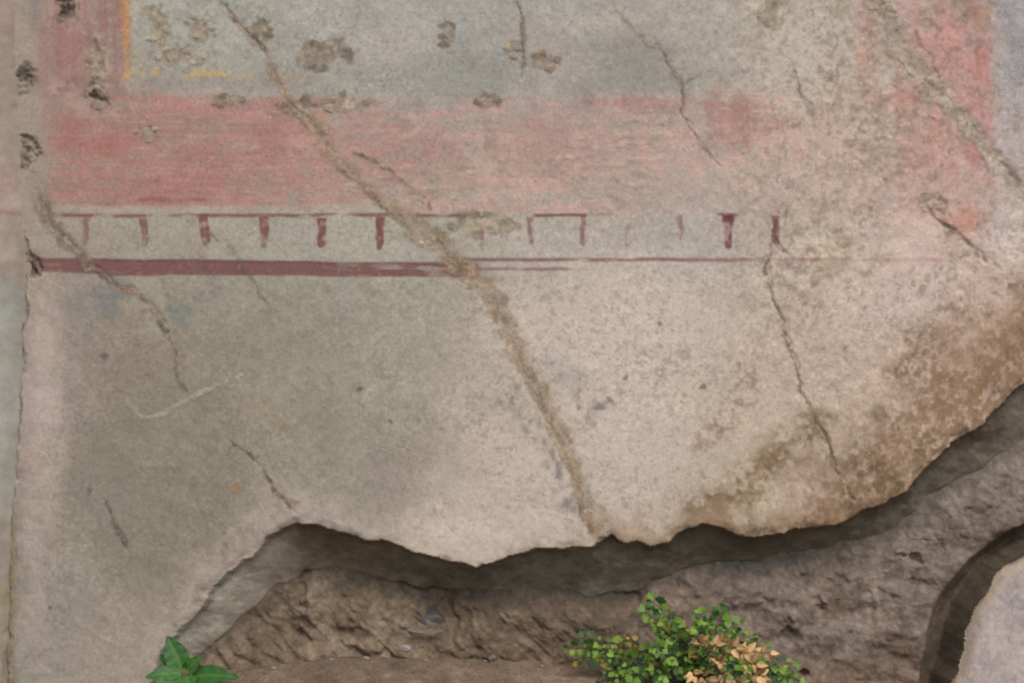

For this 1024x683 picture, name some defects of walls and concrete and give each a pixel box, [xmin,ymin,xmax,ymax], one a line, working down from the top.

spalling [15,61,38,93]
spalling [54,0,80,23]
spalling [81,37,108,109]
spalling [146,2,217,66]
spalling [297,39,354,72]
spalling [276,91,375,118]
crack [616,9,711,157]
spalling [19,134,42,169]
crack [34,193,188,390]
crack [220,0,616,540]
crack [764,221,842,481]
water stain [663,280,1024,542]